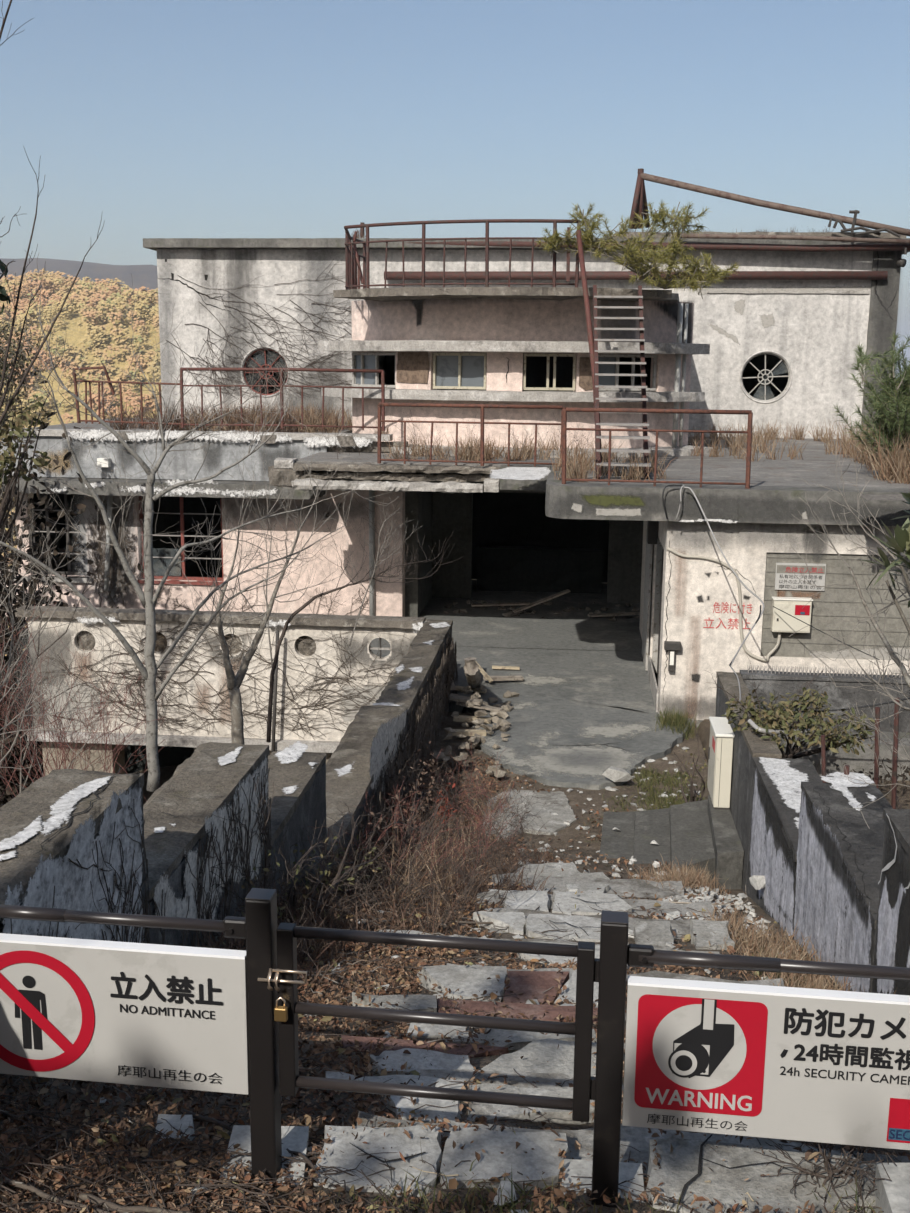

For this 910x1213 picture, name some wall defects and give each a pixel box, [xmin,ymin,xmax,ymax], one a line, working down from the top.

water stain [204,447,219,466]
water stain [264,451,294,470]
peeling [489,467,551,480]
water stain [758,780,795,875]
water stain [805,794,868,928]